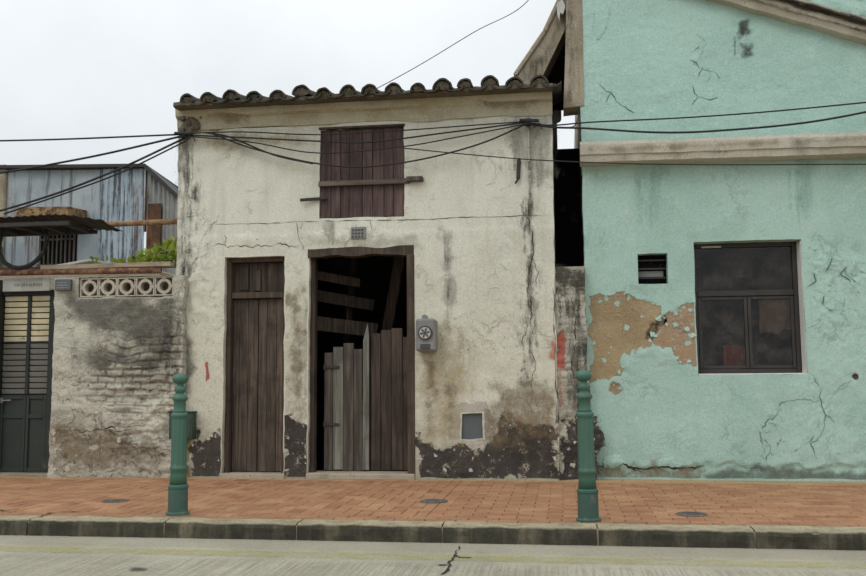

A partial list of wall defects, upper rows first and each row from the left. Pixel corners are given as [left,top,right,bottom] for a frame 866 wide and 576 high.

water stain [771,0,866,31]
crack [691,47,720,103]
crack [214,217,469,249]
water stain [486,265,587,444]
crack [497,193,586,454]
peeling [587,291,697,395]
flaking render [51,360,171,477]
flaking render [187,428,221,476]
crack [759,375,842,460]
crack [438,546,471,574]